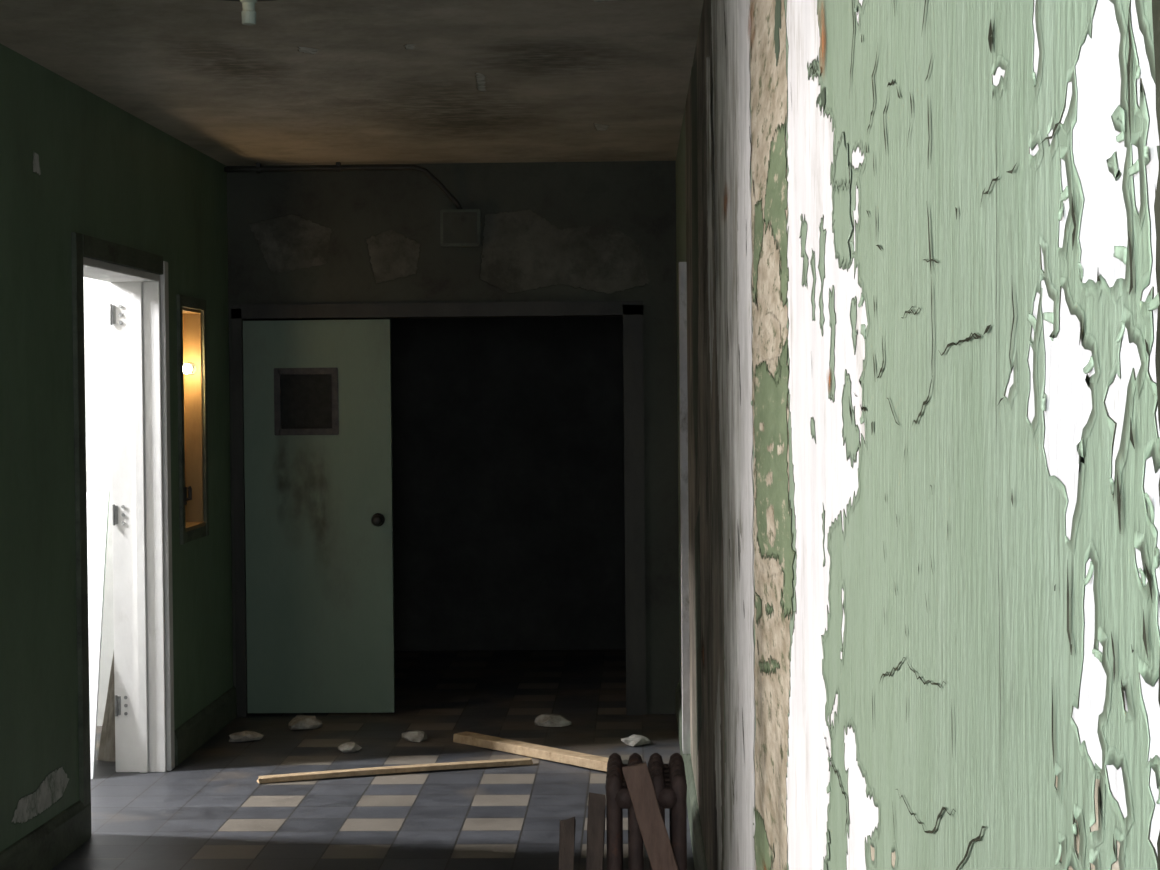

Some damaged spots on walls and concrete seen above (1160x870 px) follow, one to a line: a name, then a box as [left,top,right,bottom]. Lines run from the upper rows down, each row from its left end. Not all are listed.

peeling [988,20,1009,101]
crack [853,103,1017,456]
peeling [685,0,898,870]
peeling [997,0,1160,870]
crack [872,562,953,758]
crack [997,493,1013,723]
crack [892,789,956,836]
crack [956,826,985,870]